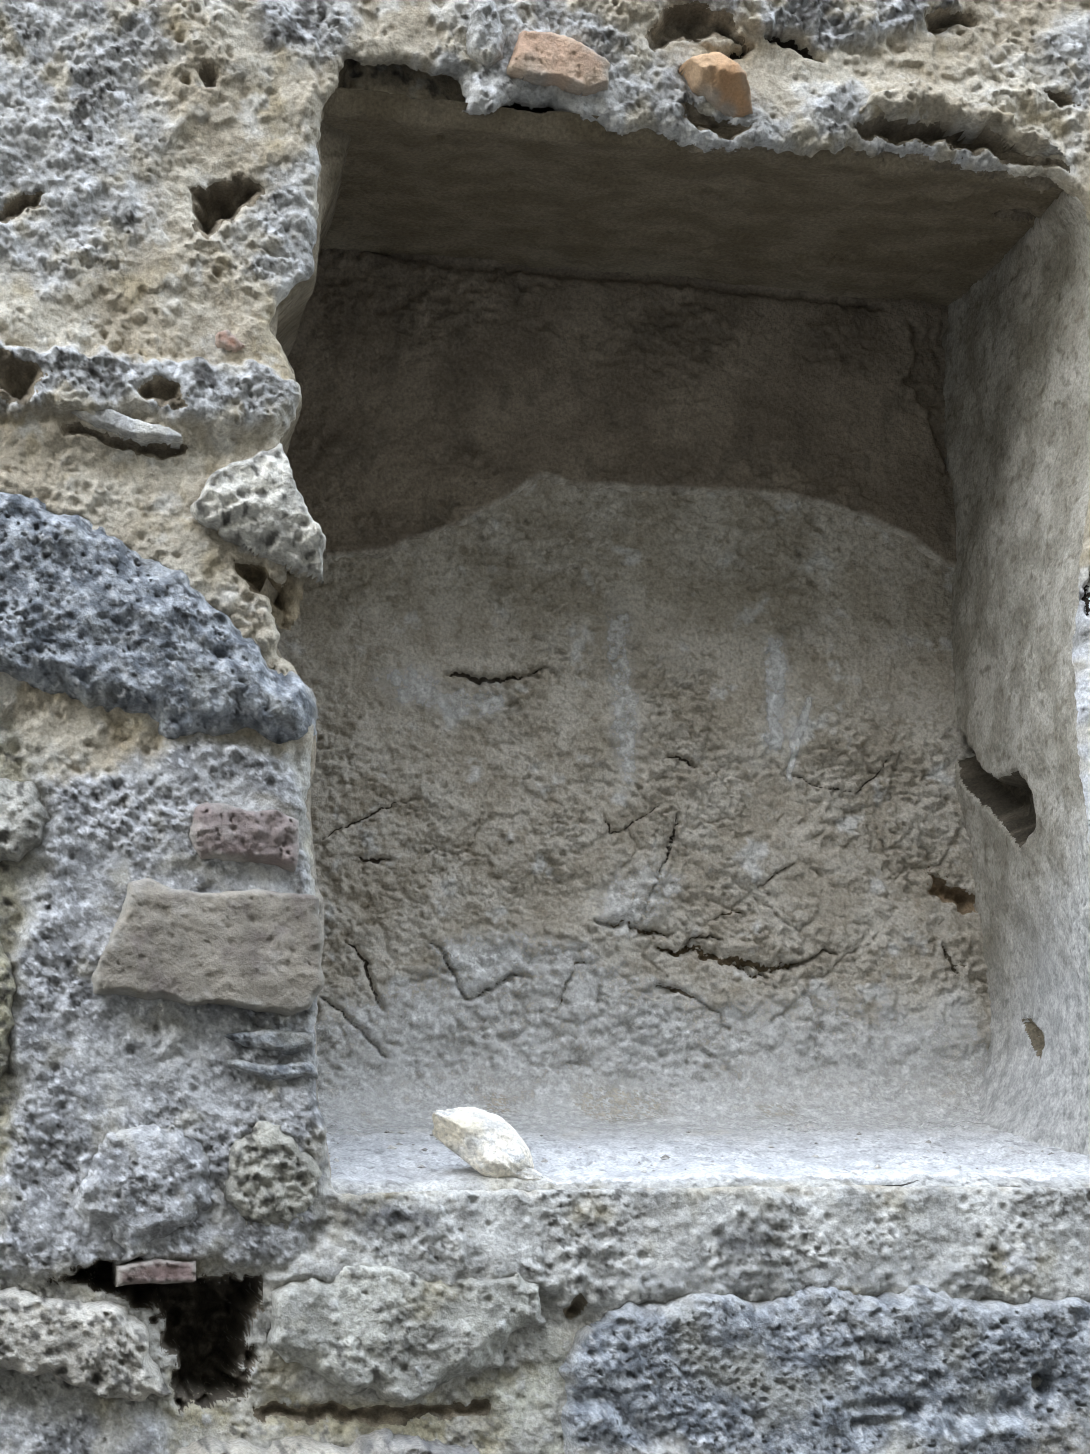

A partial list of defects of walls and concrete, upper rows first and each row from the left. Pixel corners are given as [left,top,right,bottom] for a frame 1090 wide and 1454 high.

crack [1082,572,1090,616]
crack [449,668,542,685]
crack [668,755,695,768]
crack [798,760,887,792]
crack [328,802,397,864]
crack [596,806,832,1013]
crack [324,942,383,1056]
crack [430,943,517,1000]
crack [556,961,585,1010]